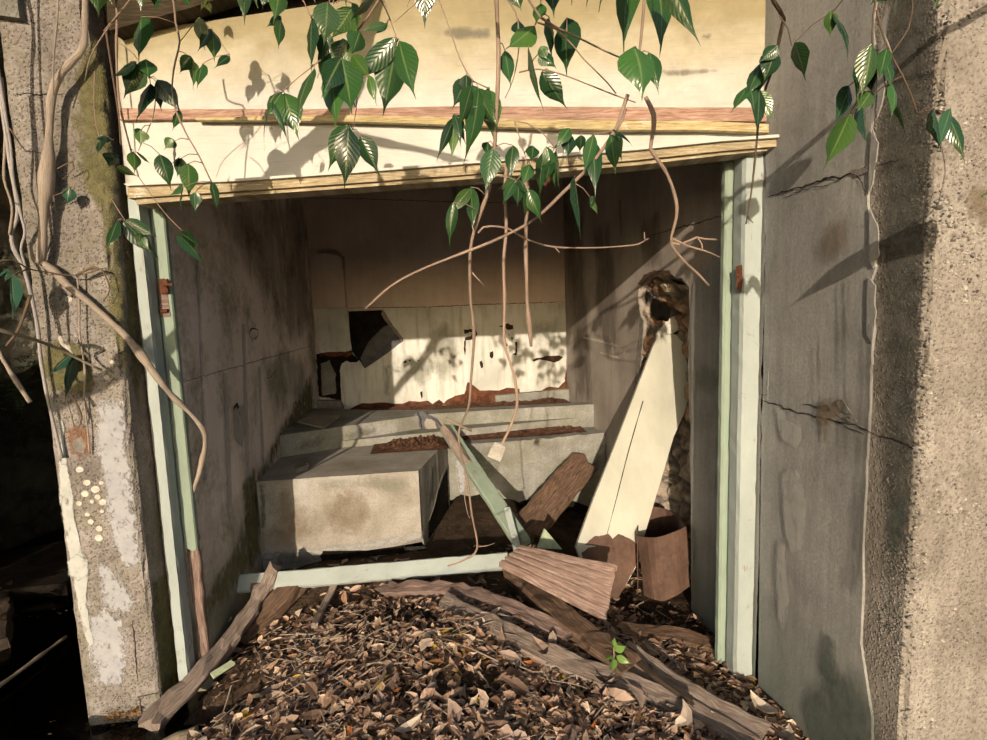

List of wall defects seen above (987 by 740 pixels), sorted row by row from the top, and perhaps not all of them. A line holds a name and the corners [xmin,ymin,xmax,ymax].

water stain [75,45,140,400]
crack [768,157,902,198]
spalling [638,270,686,285]
spalling [316,310,403,409]
spalling [634,299,672,391]
crack [762,399,913,449]